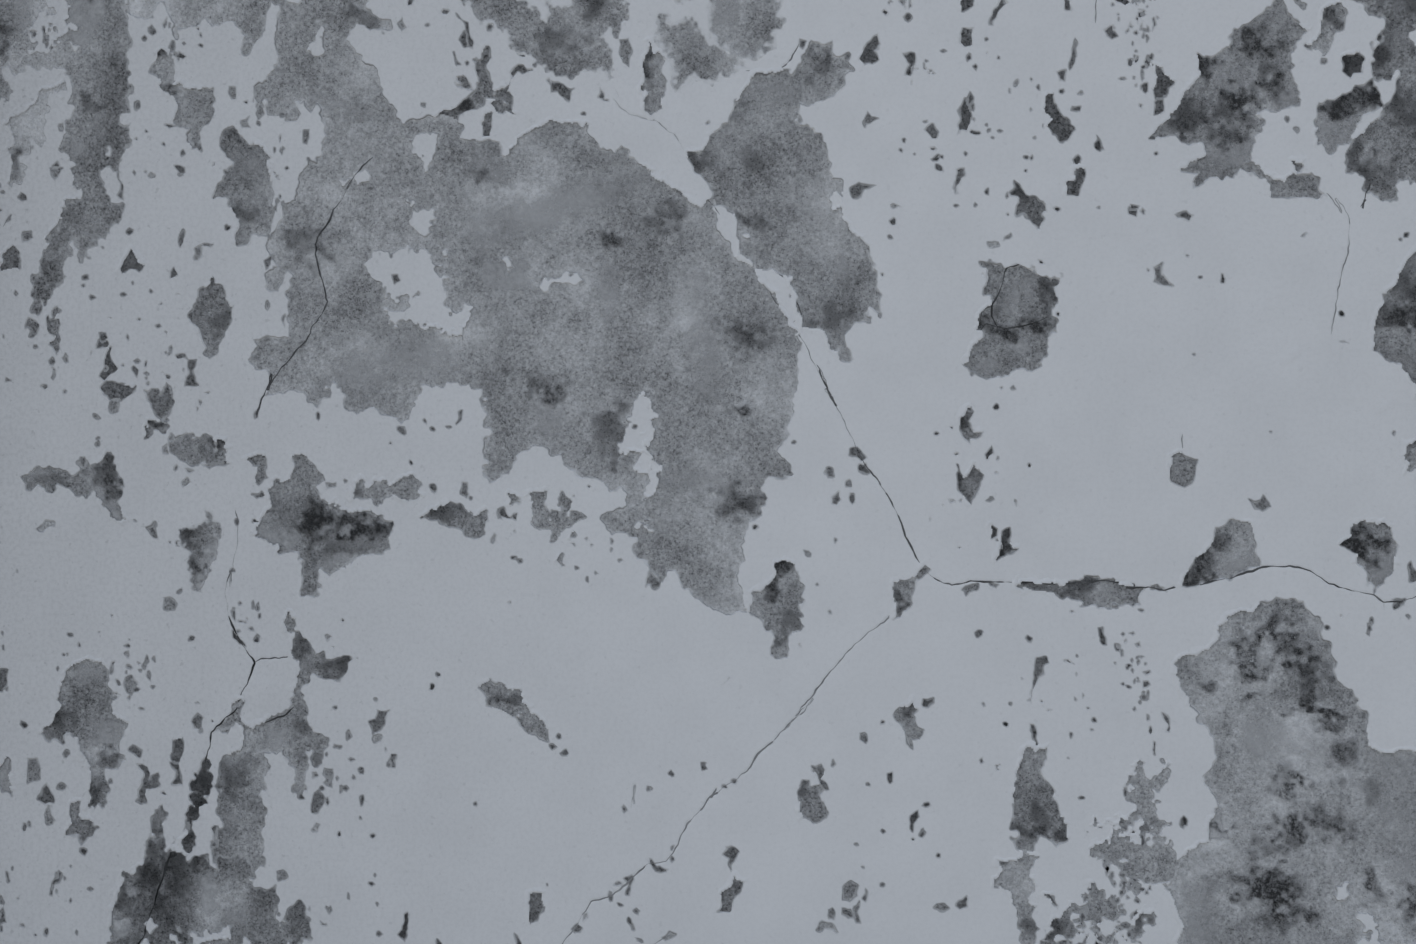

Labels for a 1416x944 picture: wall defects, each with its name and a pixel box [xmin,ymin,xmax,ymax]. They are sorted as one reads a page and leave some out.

crack [204,511,294,765]
crack [256,157,373,415]
peeling [0,0,897,944]
peeling [960,234,1060,409]
peeling [1009,40,1082,142]
peeling [1006,156,1088,229]
crack [743,262,1416,603]
peeling [963,496,1270,612]
peeling [1368,233,1416,402]
crack [138,852,172,944]
crack [562,616,889,944]
peeling [980,598,1416,944]